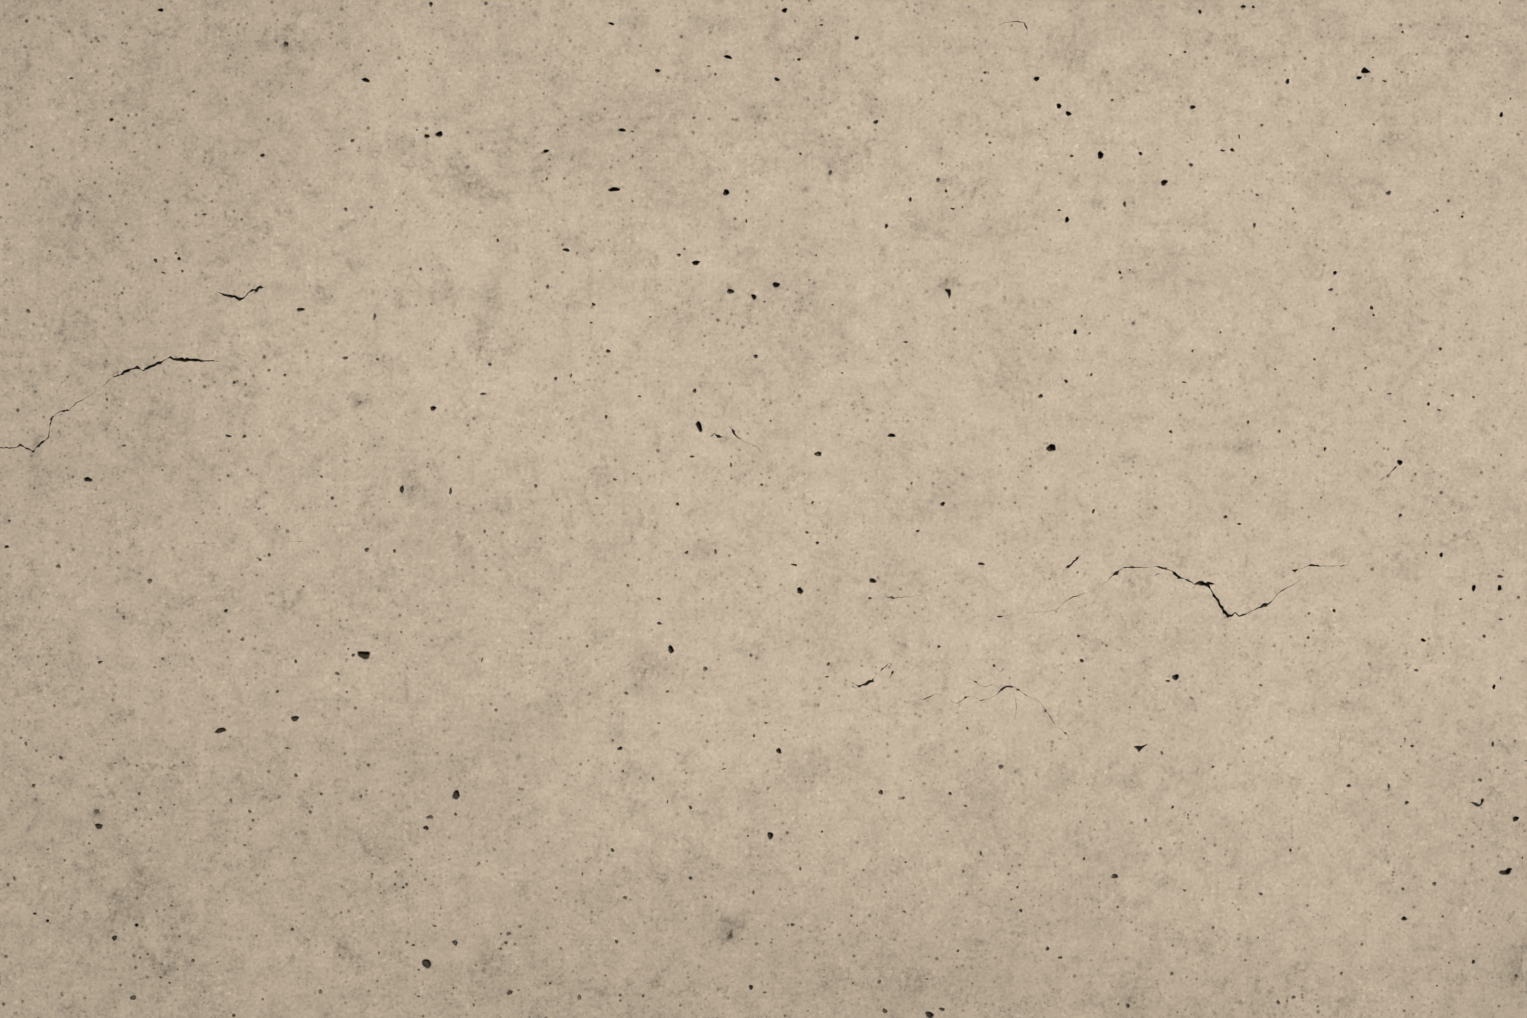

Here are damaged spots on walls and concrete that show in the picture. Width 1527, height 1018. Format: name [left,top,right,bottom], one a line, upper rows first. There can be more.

crack [0,353,241,452]
crack [996,554,1354,618]